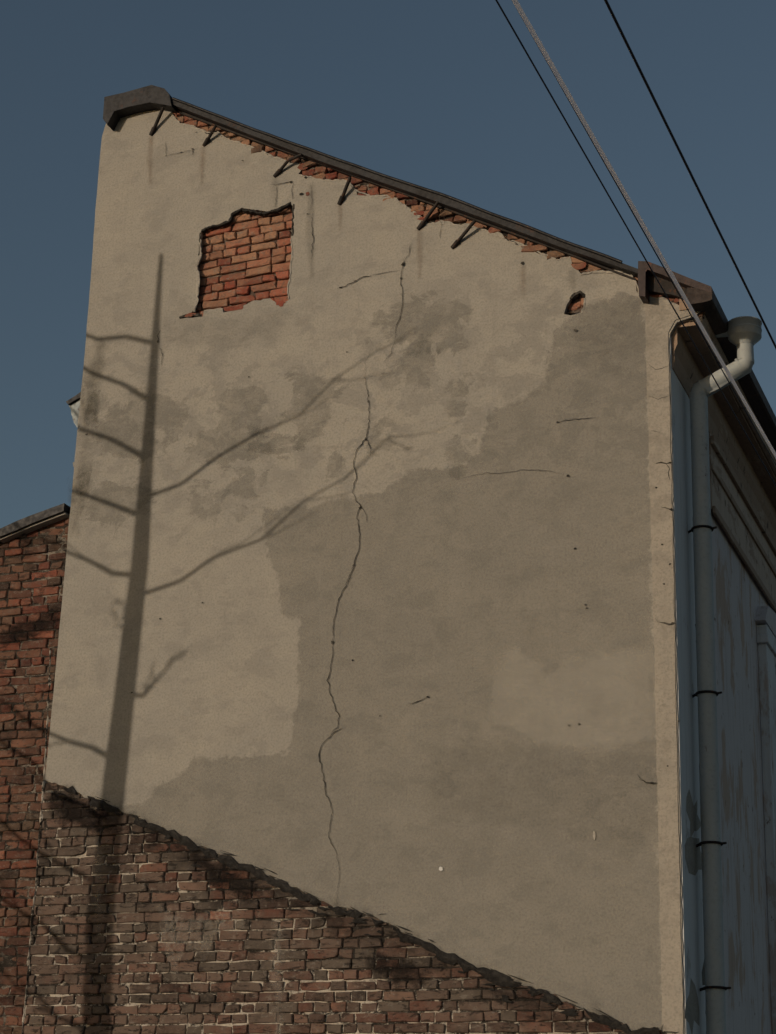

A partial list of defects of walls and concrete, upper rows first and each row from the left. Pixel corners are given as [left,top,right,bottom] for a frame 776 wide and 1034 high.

spalling [171,113,286,162]
spalling [179,203,295,319]
spalling [297,163,679,304]
spalling [566,290,586,314]
crack [318,244,411,901]